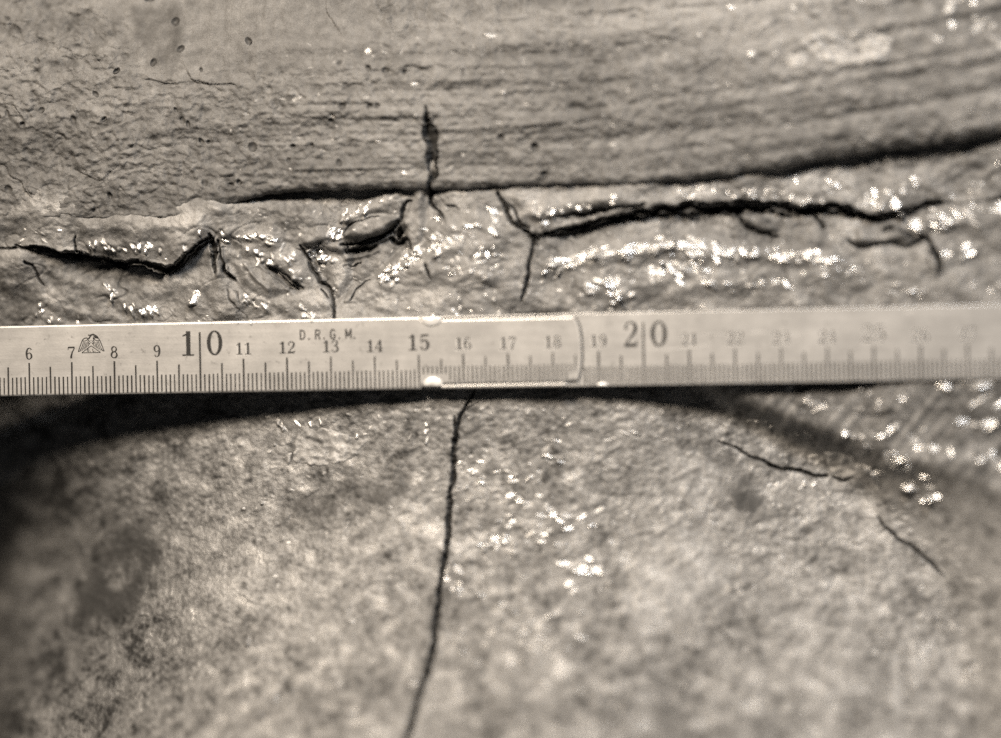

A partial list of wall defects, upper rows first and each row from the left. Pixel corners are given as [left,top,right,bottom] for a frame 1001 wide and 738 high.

crack [0,233,240,310]
crack [268,106,460,319]
crack [496,183,1001,315]
crack [717,441,853,482]
crack [403,391,479,738]
crack [877,516,945,576]